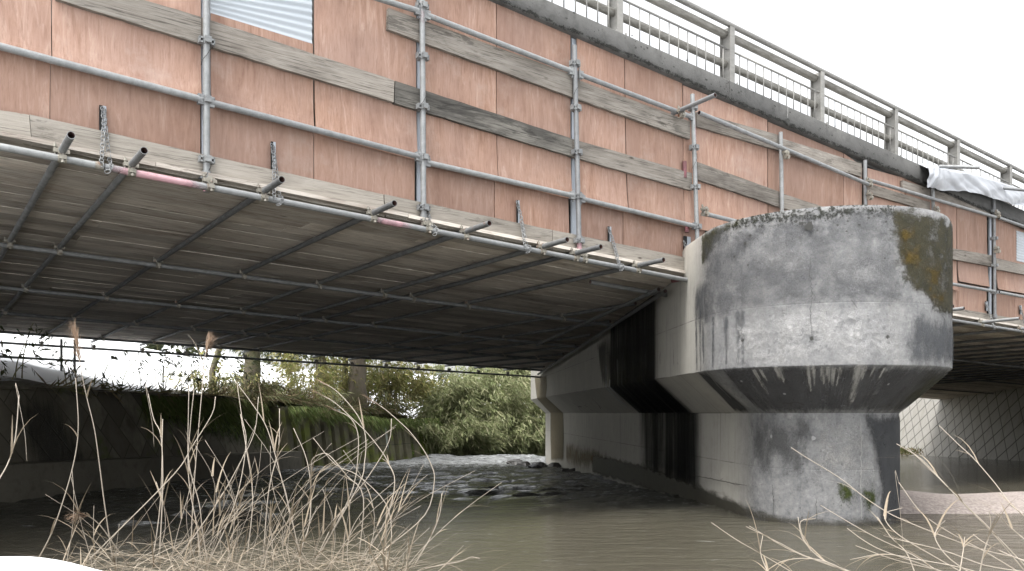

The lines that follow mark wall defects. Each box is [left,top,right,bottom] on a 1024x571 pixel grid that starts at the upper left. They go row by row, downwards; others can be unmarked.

leakage [592,208,953,526]